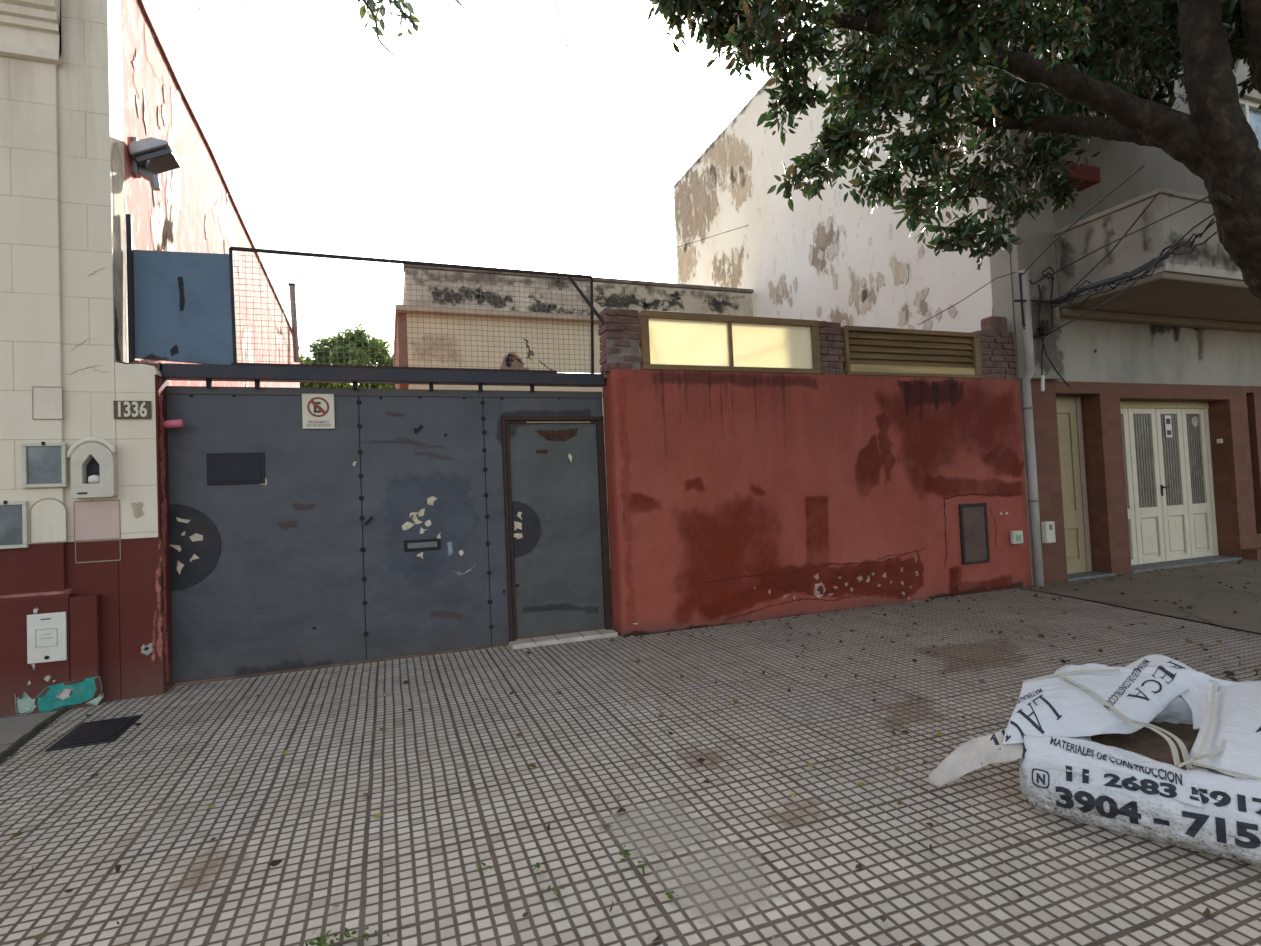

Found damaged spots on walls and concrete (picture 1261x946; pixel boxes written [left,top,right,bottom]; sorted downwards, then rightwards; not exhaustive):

peeling [132,9,181,151]
flaking render [112,142,162,371]
peeling [151,169,182,252]
peeling [204,193,242,276]
peeling [242,325,254,363]
peeling [673,133,752,288]
peeling [769,276,798,307]
peeling [809,216,957,330]
leakage [857,378,1023,496]
peeling [141,389,169,685]
leakage [623,487,804,638]
peeling [15,664,104,715]